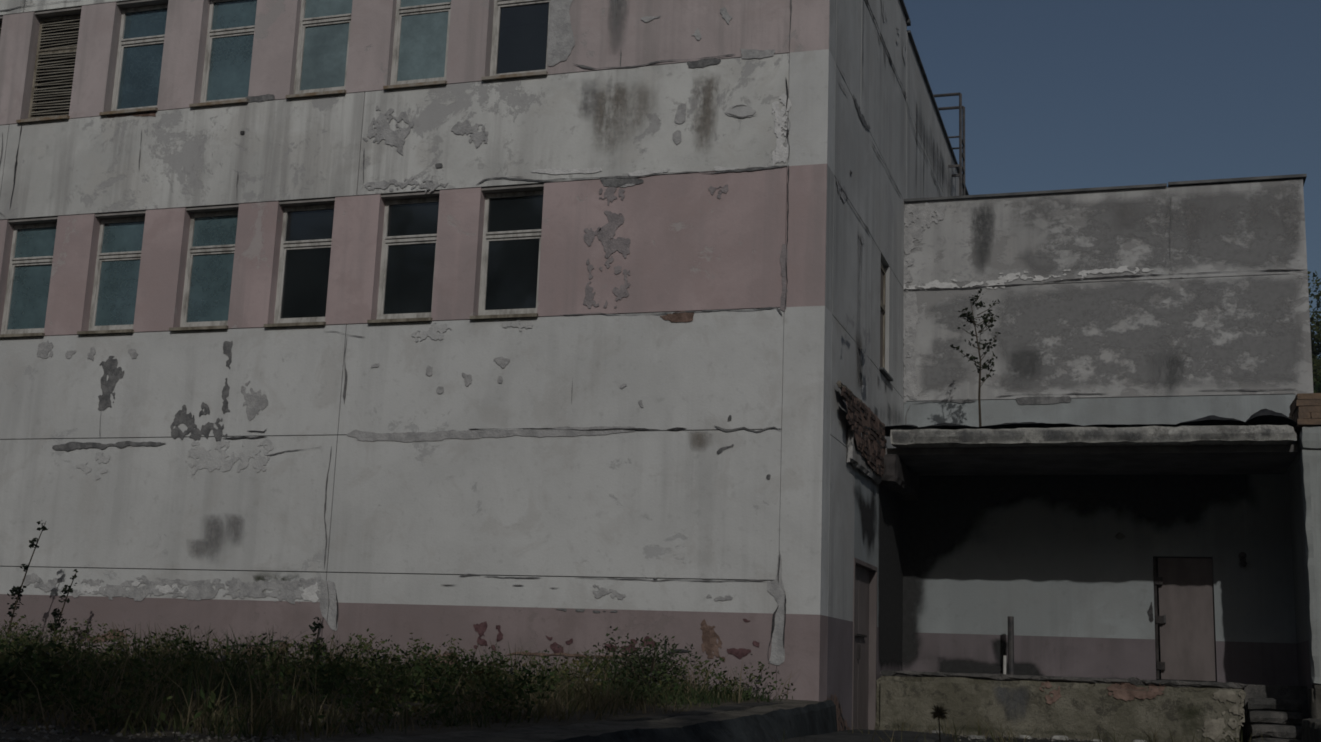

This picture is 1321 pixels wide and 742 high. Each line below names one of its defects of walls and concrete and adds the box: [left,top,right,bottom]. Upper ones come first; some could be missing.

peeling [363,106,414,155]
peeling [451,120,488,148]
peeling [673,103,686,144]
peeling [772,93,792,166]
peeling [531,167,670,308]
peeling [37,340,138,411]
peeling [170,341,268,441]
spalling [841,387,887,477]
water stain [993,640,1008,664]